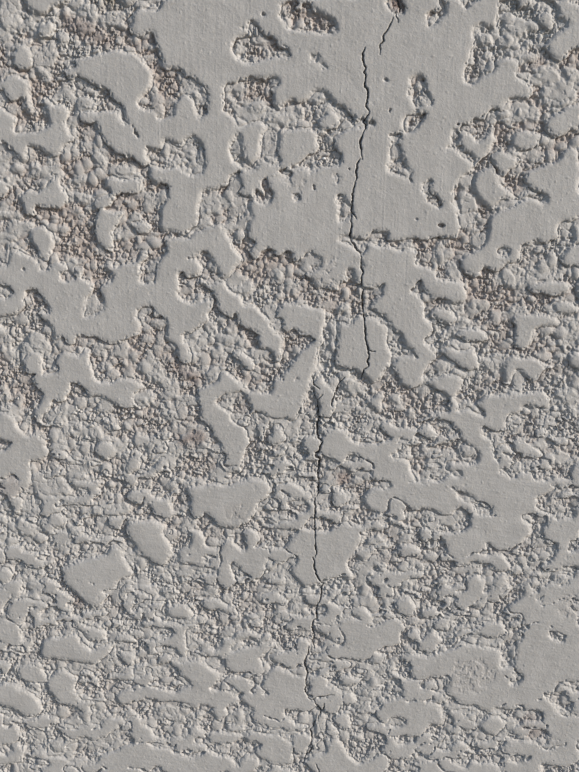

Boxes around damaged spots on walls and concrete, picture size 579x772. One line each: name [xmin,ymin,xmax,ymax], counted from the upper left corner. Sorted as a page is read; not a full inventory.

crack [304,0,401,770]